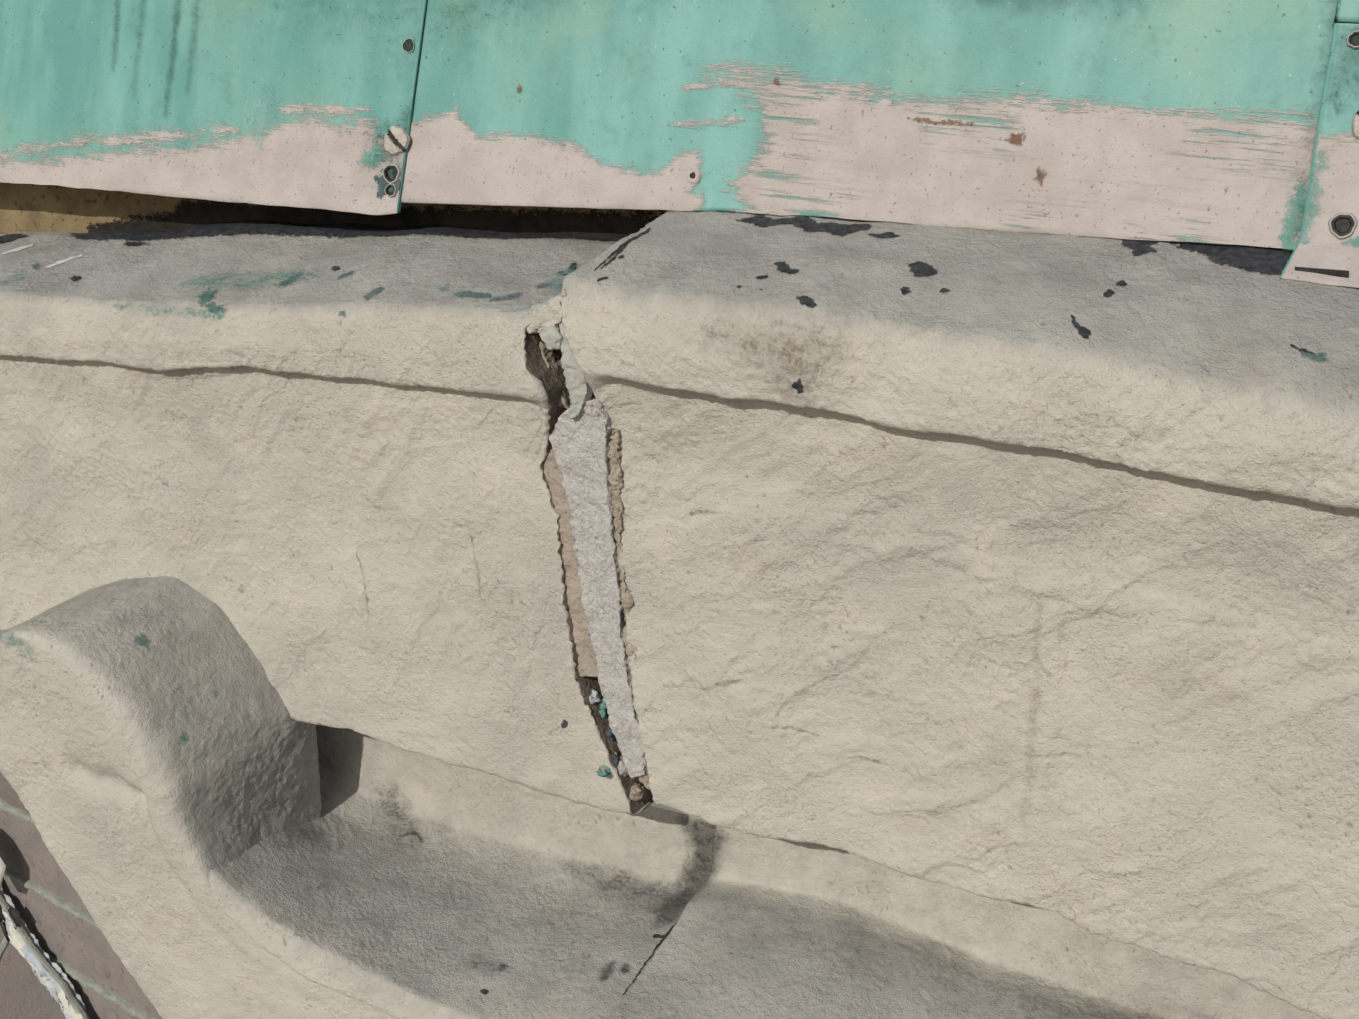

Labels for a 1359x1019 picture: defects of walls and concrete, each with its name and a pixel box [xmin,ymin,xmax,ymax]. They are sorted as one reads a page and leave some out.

crack [594,228,650,282]
crack [526,294,594,409]
crack [607,428,638,686]
crack [639,755,650,790]
crack [622,923,676,995]